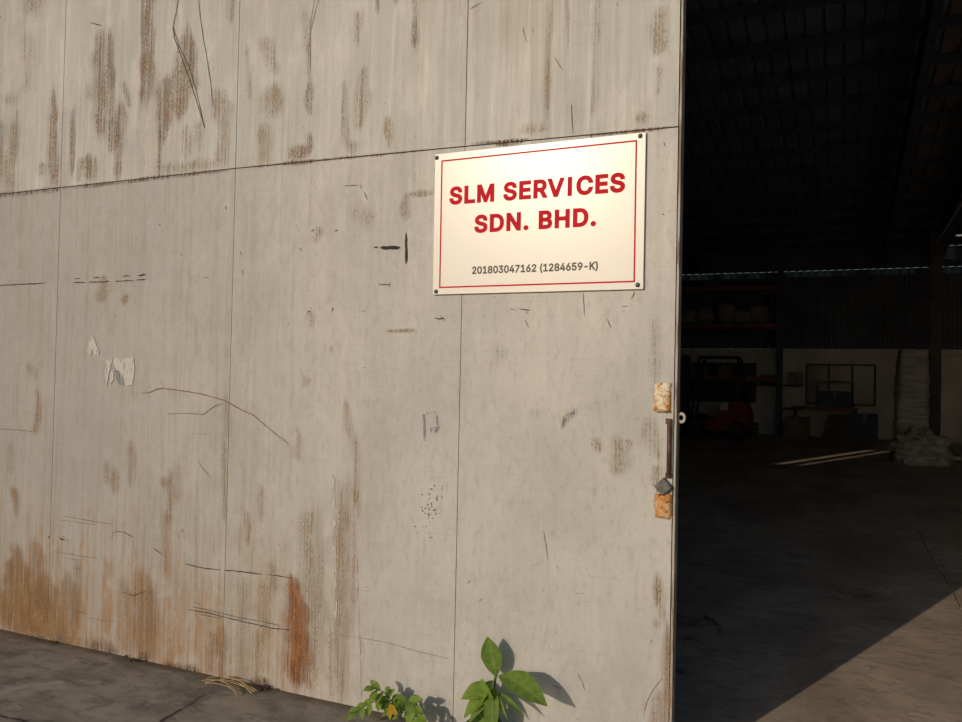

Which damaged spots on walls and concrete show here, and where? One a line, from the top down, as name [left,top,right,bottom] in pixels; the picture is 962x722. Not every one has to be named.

rust [0,94,58,196]
rust [70,0,226,188]
rust [259,123,422,167]
peeling [105,357,135,386]
rust [283,505,355,692]